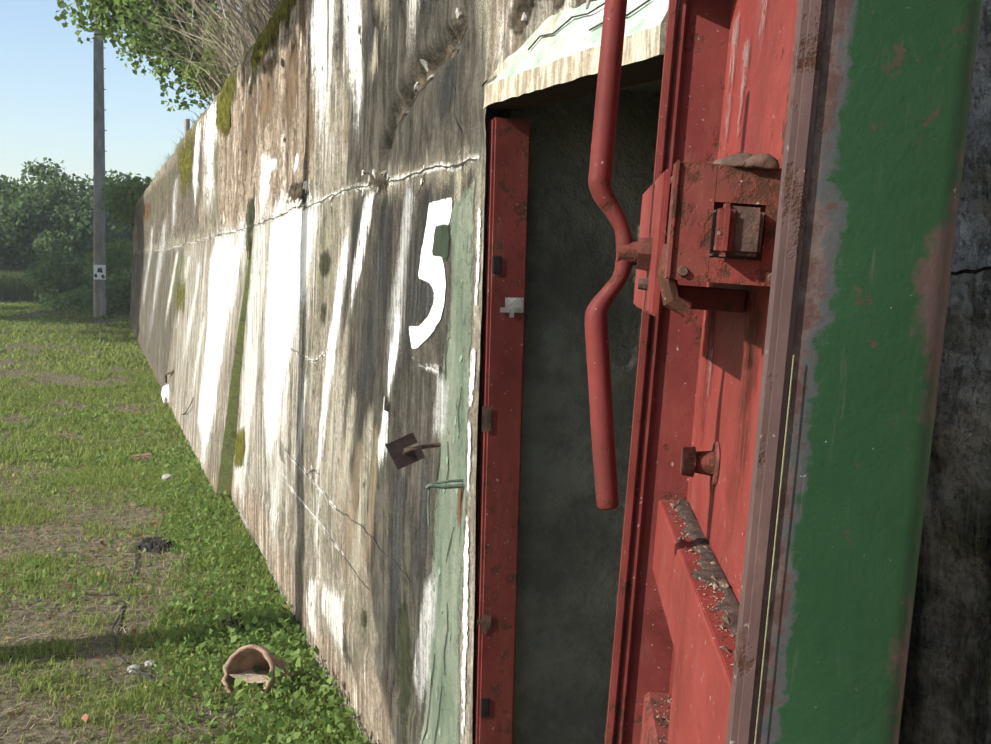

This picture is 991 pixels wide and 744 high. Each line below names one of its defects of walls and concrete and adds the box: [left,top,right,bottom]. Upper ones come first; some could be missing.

leakage [192,102,218,207]
leakage [244,58,274,175]
leakage [286,40,298,127]
crack [154,84,479,252]
leakage [294,0,434,171]
spalling [397,8,468,125]
crack [951,266,991,275]
leakage [143,154,319,547]
leakage [314,188,432,607]